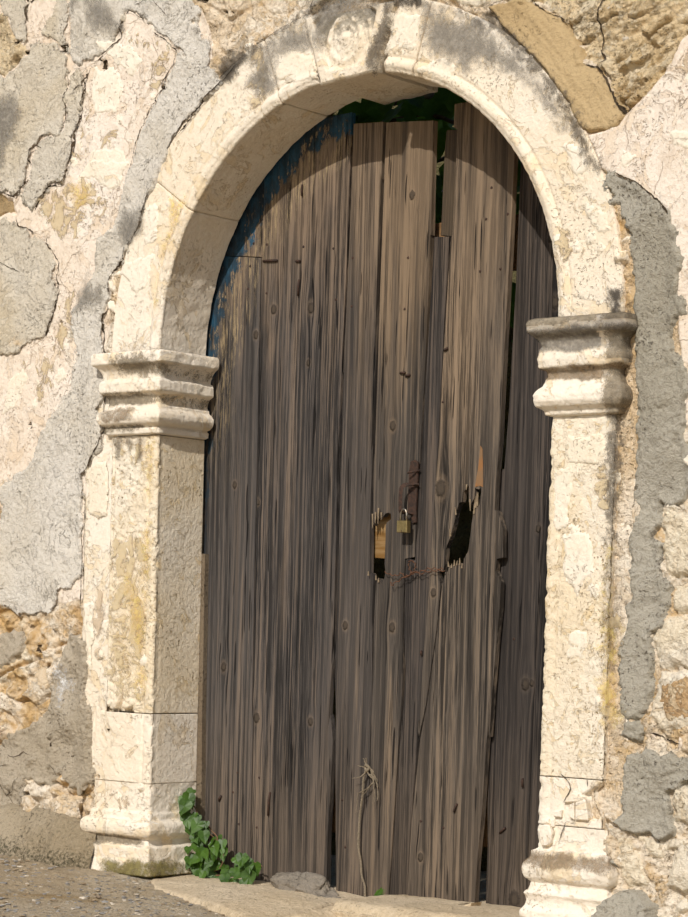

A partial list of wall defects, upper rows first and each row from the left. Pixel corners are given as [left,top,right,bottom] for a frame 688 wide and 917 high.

spalling [0,13,29,77]
crack [583,0,628,115]
spalling [526,0,688,110]
peeling [37,29,171,241]
spalling [0,193,16,217]
peeling [109,203,159,294]
peeling [85,461,109,519]
peeling [112,436,155,477]
peeling [83,534,152,701]
peeling [594,609,626,718]
spalling [660,676,688,721]